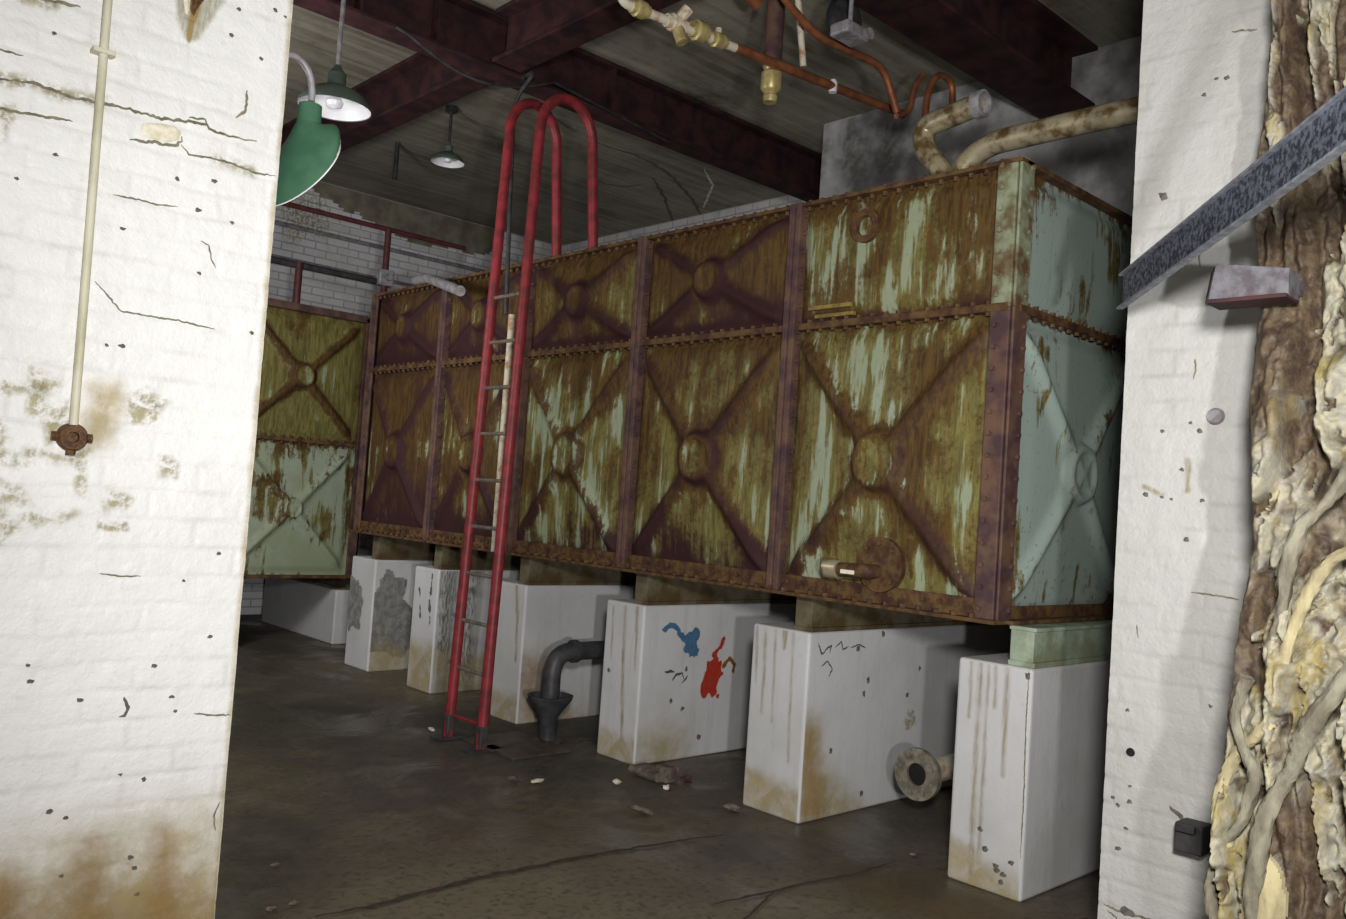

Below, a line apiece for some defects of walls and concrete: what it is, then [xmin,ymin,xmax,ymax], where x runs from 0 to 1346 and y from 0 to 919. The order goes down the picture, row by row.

crack [28,0,81,8]
spalling [181,0,210,41]
crack [0,49,275,176]
crack [95,281,214,329]
damp [3,380,55,413]
damp [77,392,117,458]
damp [131,395,160,422]
spalling [347,569,451,657]
crack [315,834,723,917]